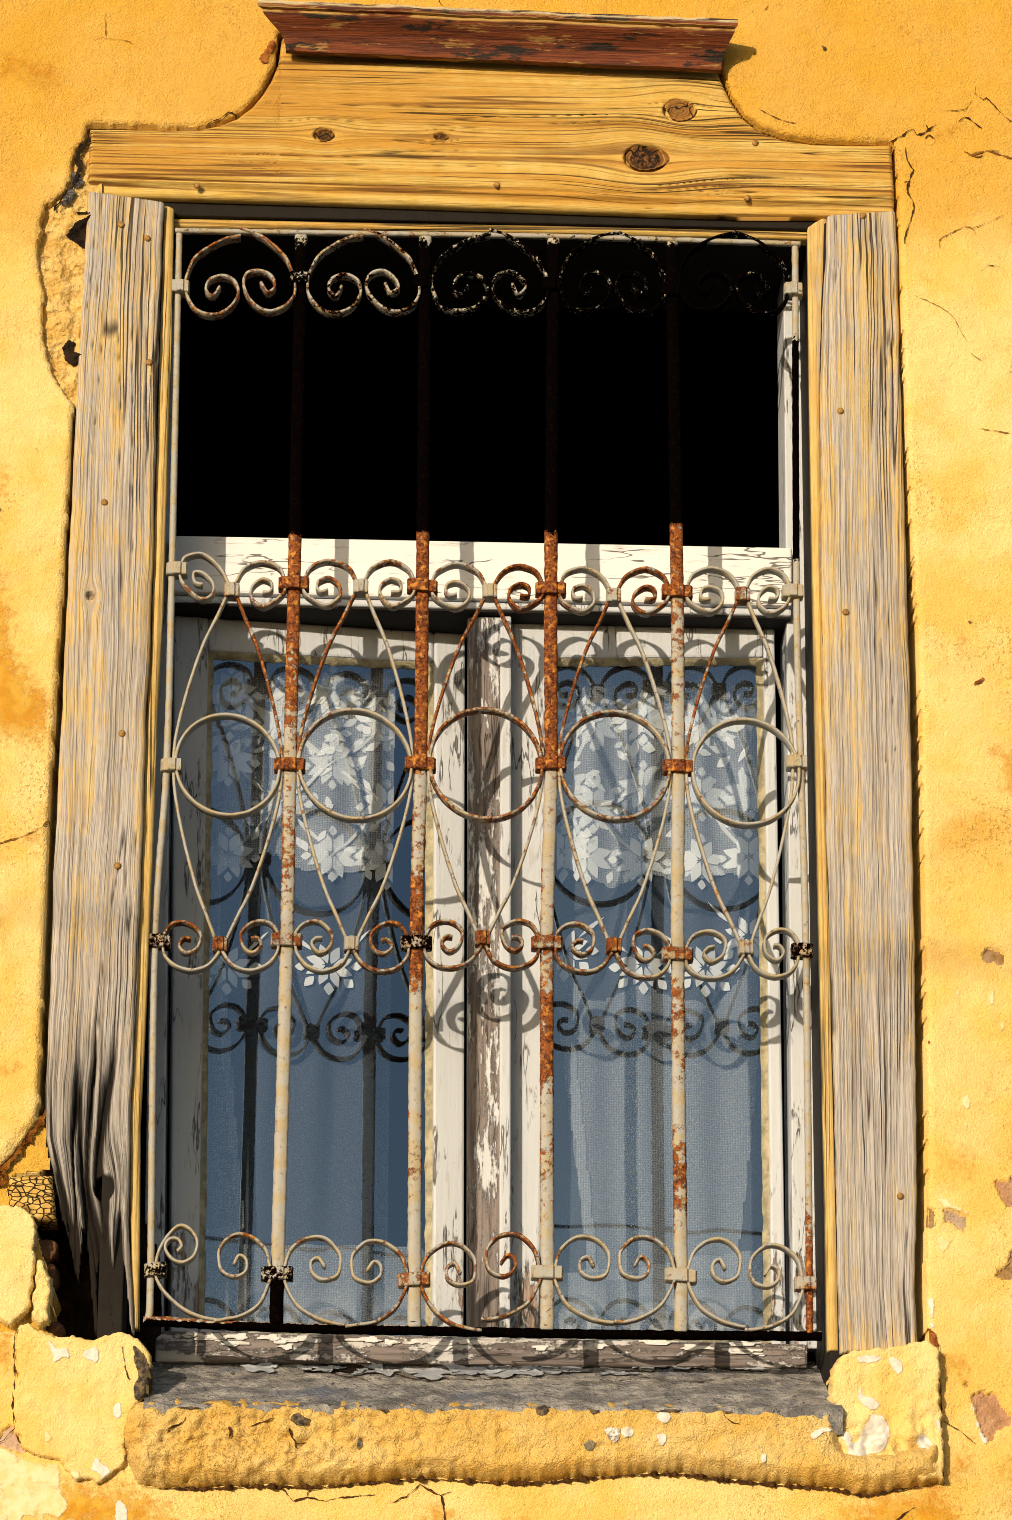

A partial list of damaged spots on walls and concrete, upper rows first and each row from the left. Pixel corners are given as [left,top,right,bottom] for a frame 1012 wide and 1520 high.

crack [891,88,1012,269]
flaking render [37,133,102,409]
flaking render [0,1117,50,1205]
spalling [0,1195,99,1362]
spalling [127,1212,162,1362]
flaking render [926,1197,968,1252]
flaking render [995,1179,1012,1207]
flaking render [995,1252,1012,1280]
peeling [182,1331,770,1380]
flaking render [964,1383,1011,1444]
peeling [0,1427,110,1520]
peeling [115,1500,127,1520]